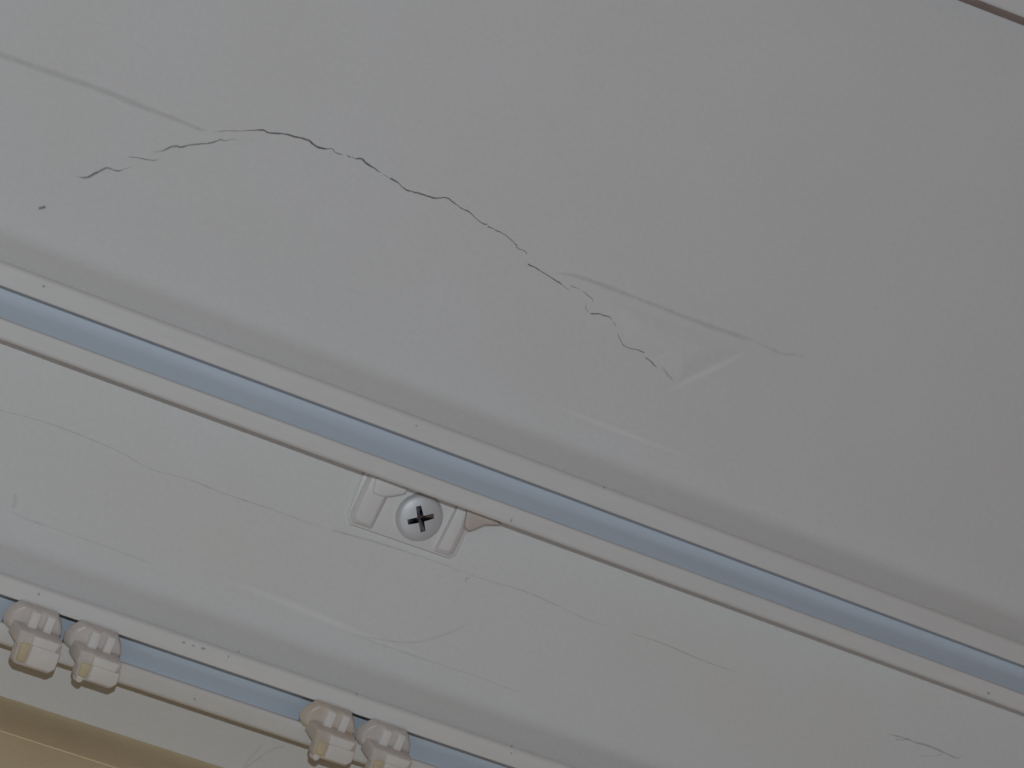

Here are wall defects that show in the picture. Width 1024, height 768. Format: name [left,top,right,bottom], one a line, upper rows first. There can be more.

crack [140,123,266,160]